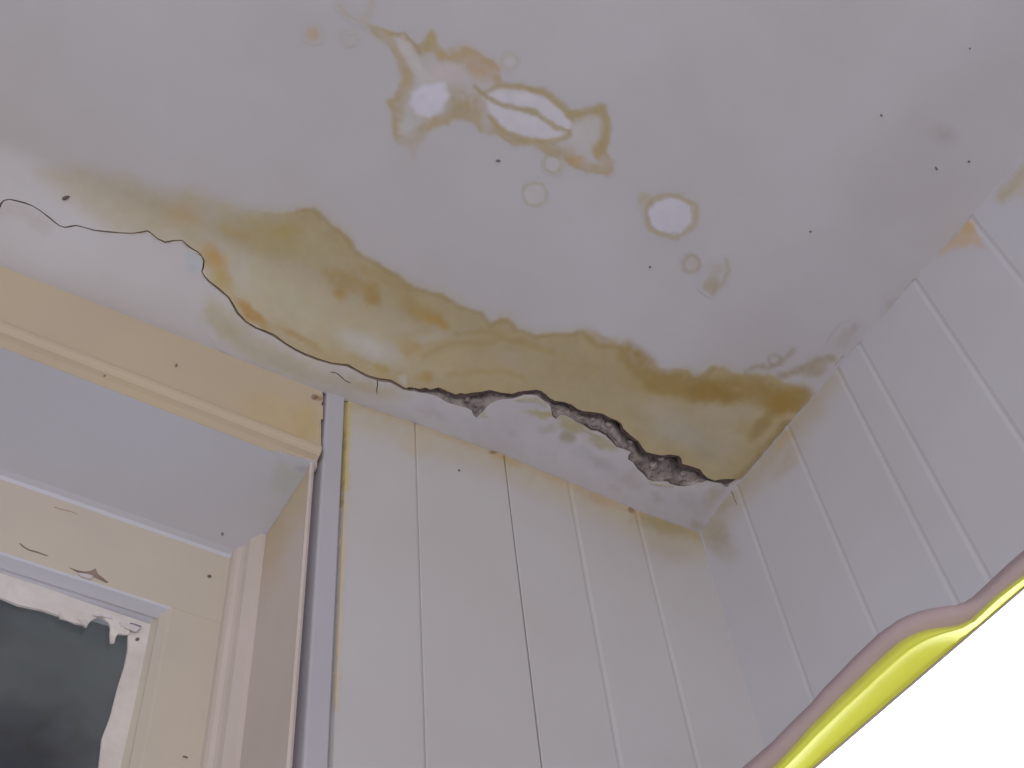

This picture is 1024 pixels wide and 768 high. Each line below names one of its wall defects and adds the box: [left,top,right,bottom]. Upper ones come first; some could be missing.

leakage [301,0,618,210]
crack [0,199,411,394]
leakage [30,156,864,713]
flaking render [408,387,736,488]
peeling [59,610,141,644]